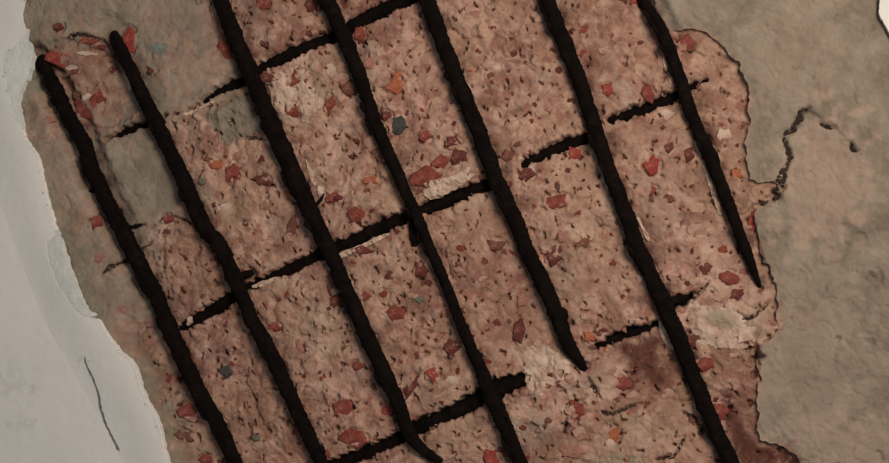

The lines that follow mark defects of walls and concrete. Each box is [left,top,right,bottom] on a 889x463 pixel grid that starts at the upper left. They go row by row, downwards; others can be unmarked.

rust [695,140,721,166]
crack [756,108,834,207]
spalling [1,0,512,463]
spalling [336,0,720,463]
spalling [556,0,889,463]
rust [624,340,663,382]
rust [726,404,794,463]